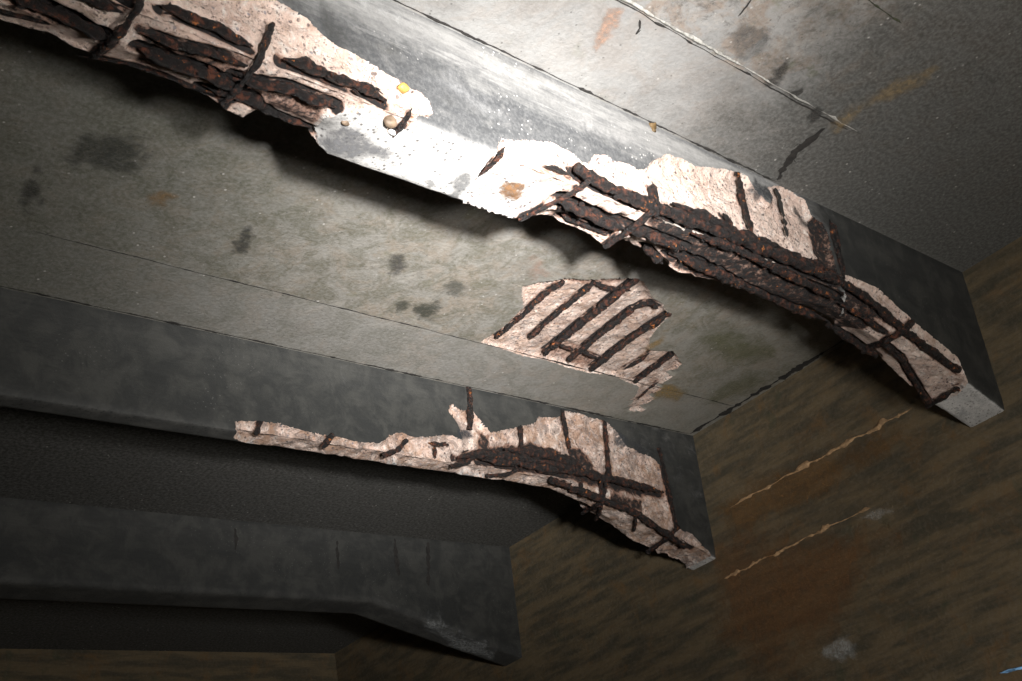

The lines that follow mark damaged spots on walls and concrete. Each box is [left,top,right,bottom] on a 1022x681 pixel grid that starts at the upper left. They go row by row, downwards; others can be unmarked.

spalling [0,0,433,145]
spalling [462,138,968,412]
spalling [234,387,711,568]